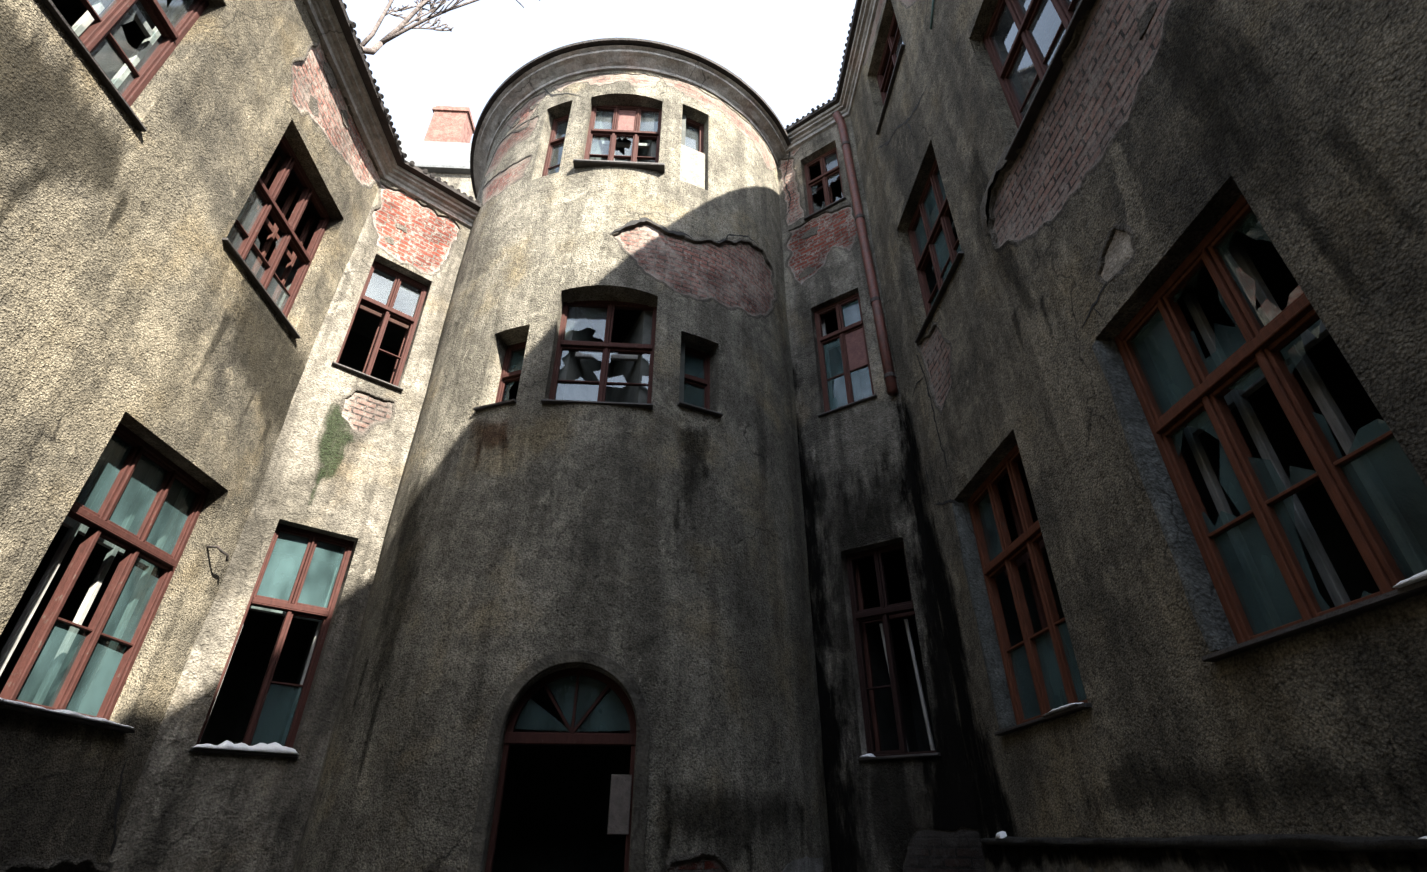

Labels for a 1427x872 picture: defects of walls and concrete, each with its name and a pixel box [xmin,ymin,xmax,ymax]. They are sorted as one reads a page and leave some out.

water stain [0,15,118,221]
water stain [110,201,127,226]
flaking render [290,37,463,277]
flaking render [482,72,858,319]
flaking render [988,0,1175,252]
flaking render [1095,223,1137,286]
flaking render [339,388,397,438]
water stain [793,366,1427,872]
flaking render [0,853,111,872]
flaking render [660,847,733,872]